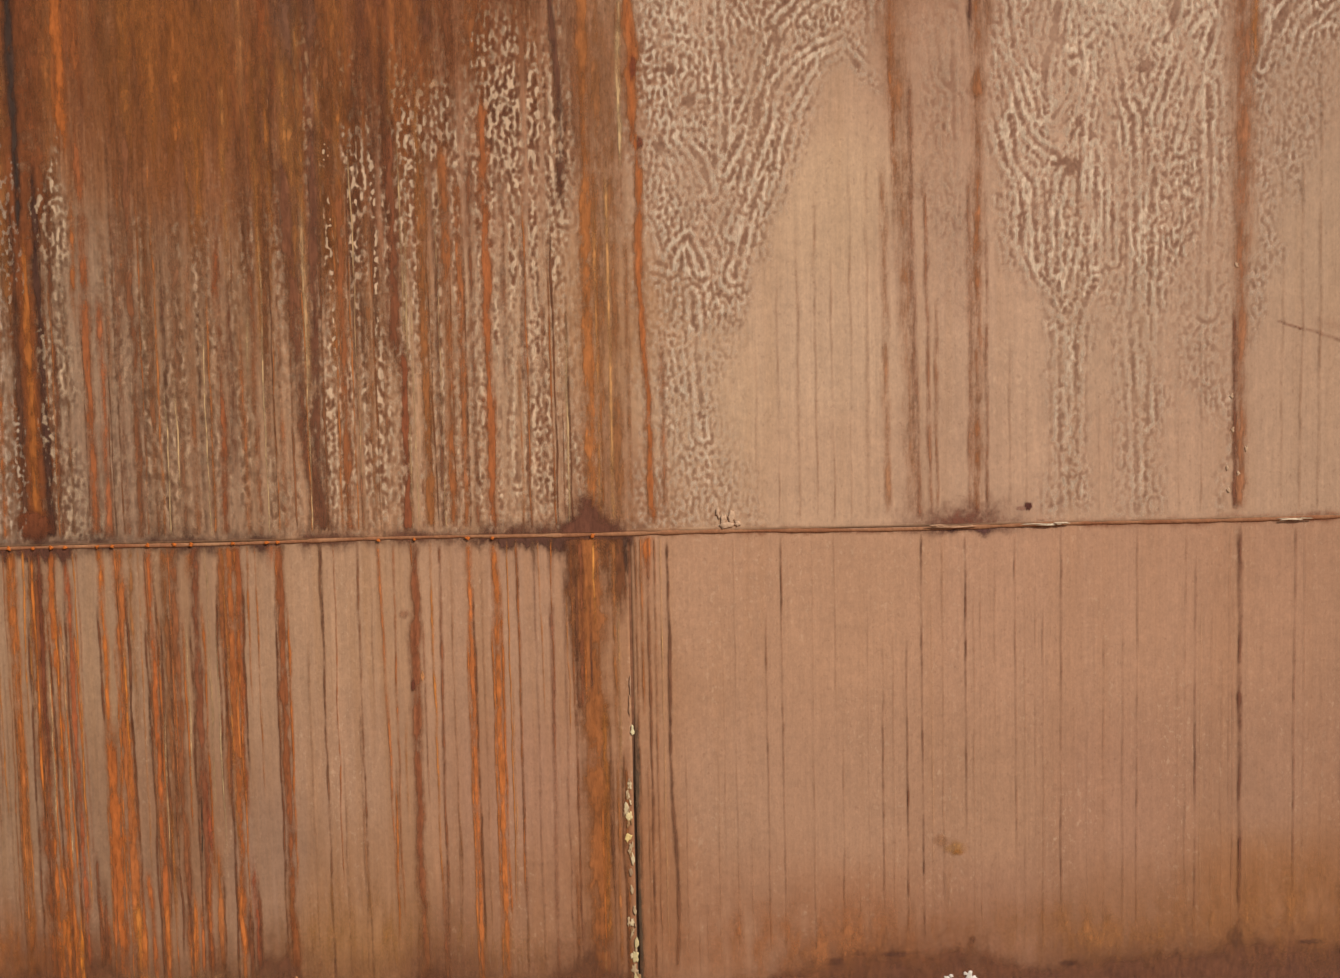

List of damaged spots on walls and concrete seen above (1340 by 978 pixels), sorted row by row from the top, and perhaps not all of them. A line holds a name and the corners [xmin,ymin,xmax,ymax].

rust [0,0,669,978]
rust [1226,0,1259,505]
damp [553,729,644,978]
damp [773,921,1340,978]